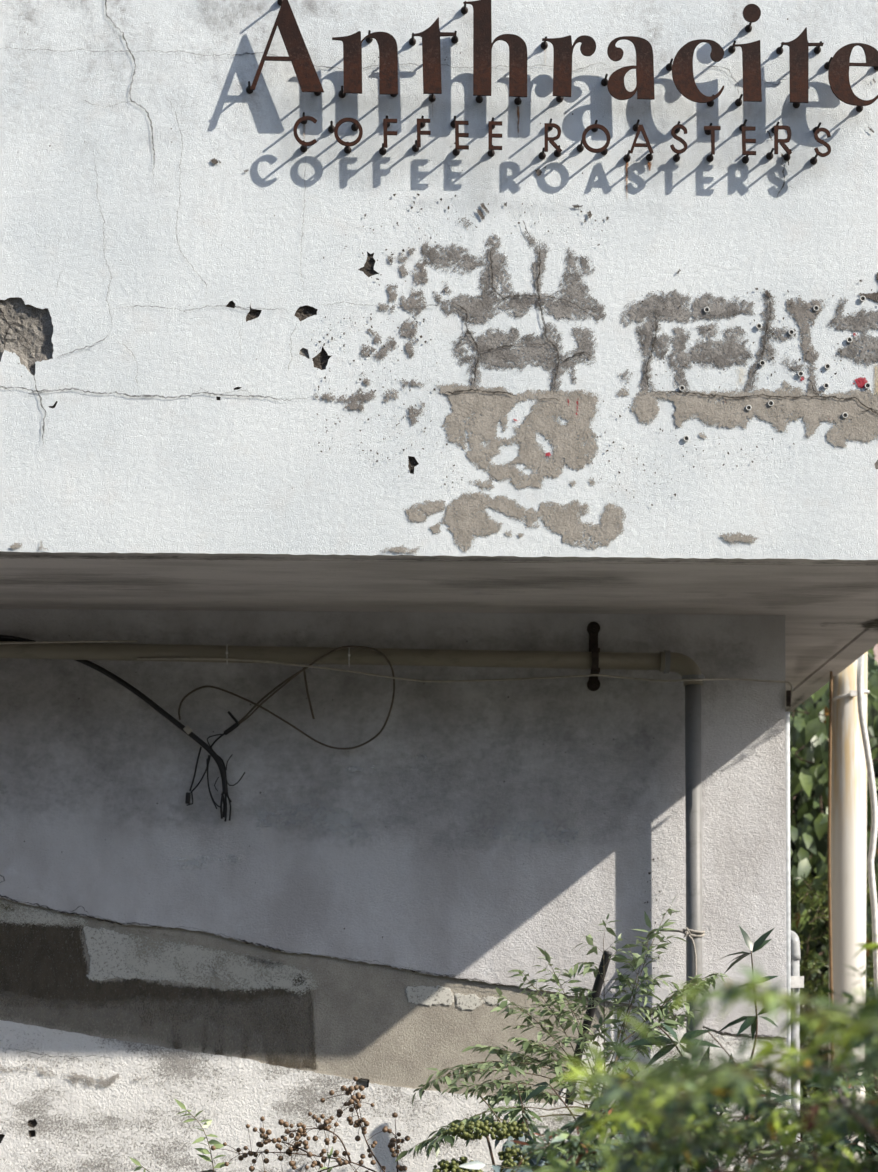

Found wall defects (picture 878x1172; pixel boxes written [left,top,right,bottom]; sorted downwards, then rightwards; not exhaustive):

crack [105,0,155,176]
peeling [462,203,489,230]
crack [0,308,16,349]
flaking render [0,297,54,376]
crack [0,378,313,444]
peeling [314,231,627,552]
crack [418,221,597,401]
peeling [616,273,878,448]
crack [637,293,878,415]
peeling [719,532,757,545]
flaking render [0,898,649,1104]
flaking render [703,1026,786,1042]